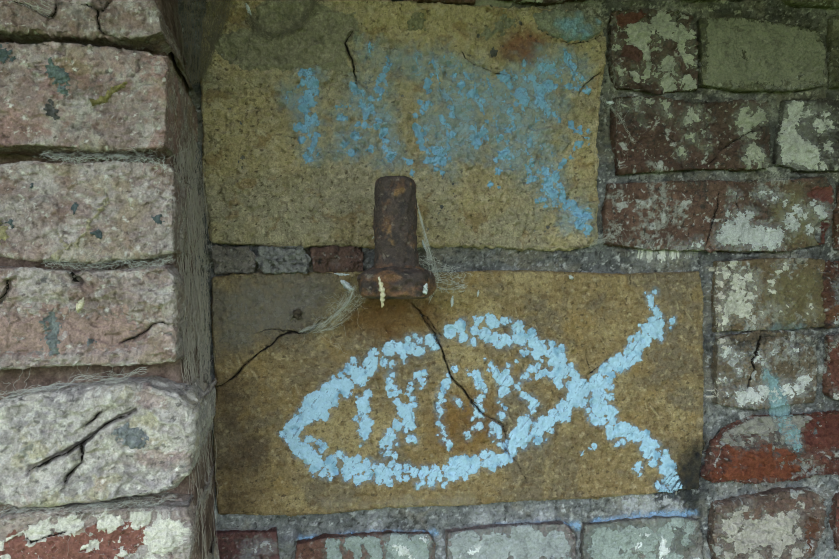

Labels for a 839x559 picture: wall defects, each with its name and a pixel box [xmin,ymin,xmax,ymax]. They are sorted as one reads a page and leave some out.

crack [217,322,319,387]
crack [414,306,526,479]
crack [747,336,761,389]
crack [27,412,130,483]
peeling [0,508,192,559]